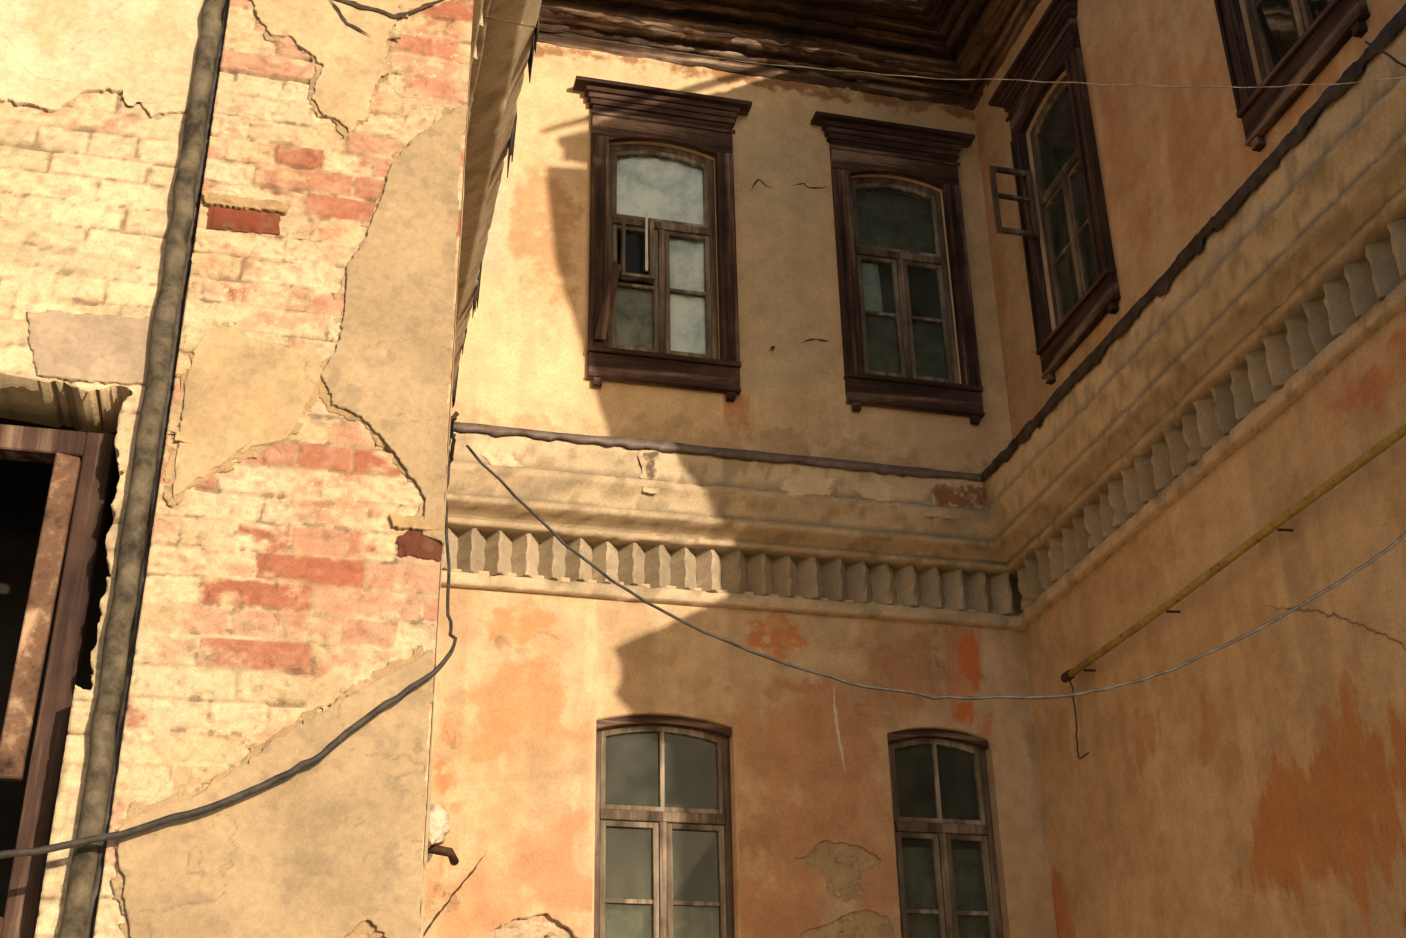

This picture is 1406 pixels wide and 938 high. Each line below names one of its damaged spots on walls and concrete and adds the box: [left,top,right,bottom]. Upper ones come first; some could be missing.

flaking render [0,0,123,112]
crack [330,0,442,36]
flaking render [26,309,153,386]
flaking render [111,0,474,938]
crack [1268,605,1406,650]
crack [423,853,486,937]
spalling [487,914,574,938]
spalling [795,841,902,938]